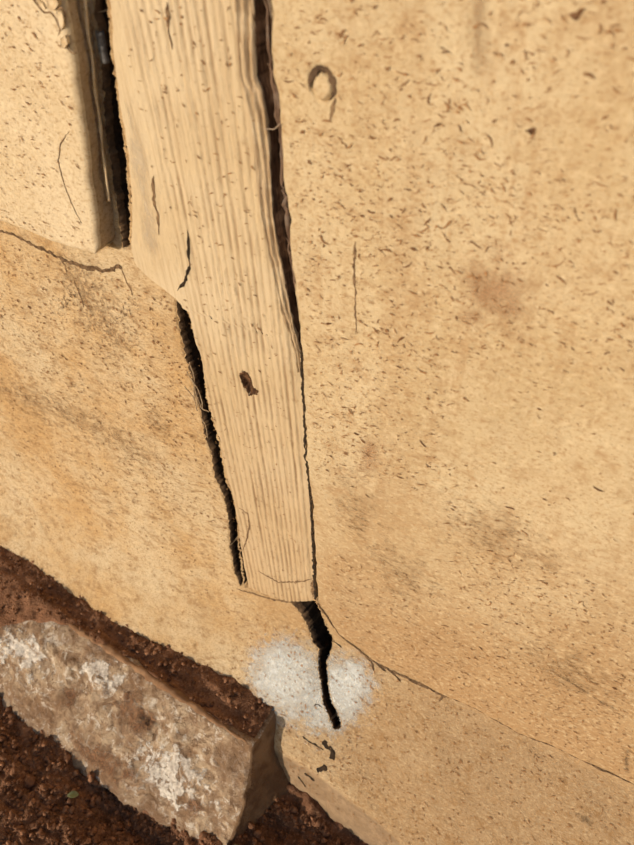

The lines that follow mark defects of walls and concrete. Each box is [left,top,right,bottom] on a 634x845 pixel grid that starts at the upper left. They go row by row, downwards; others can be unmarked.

crack [174,0,633,787]